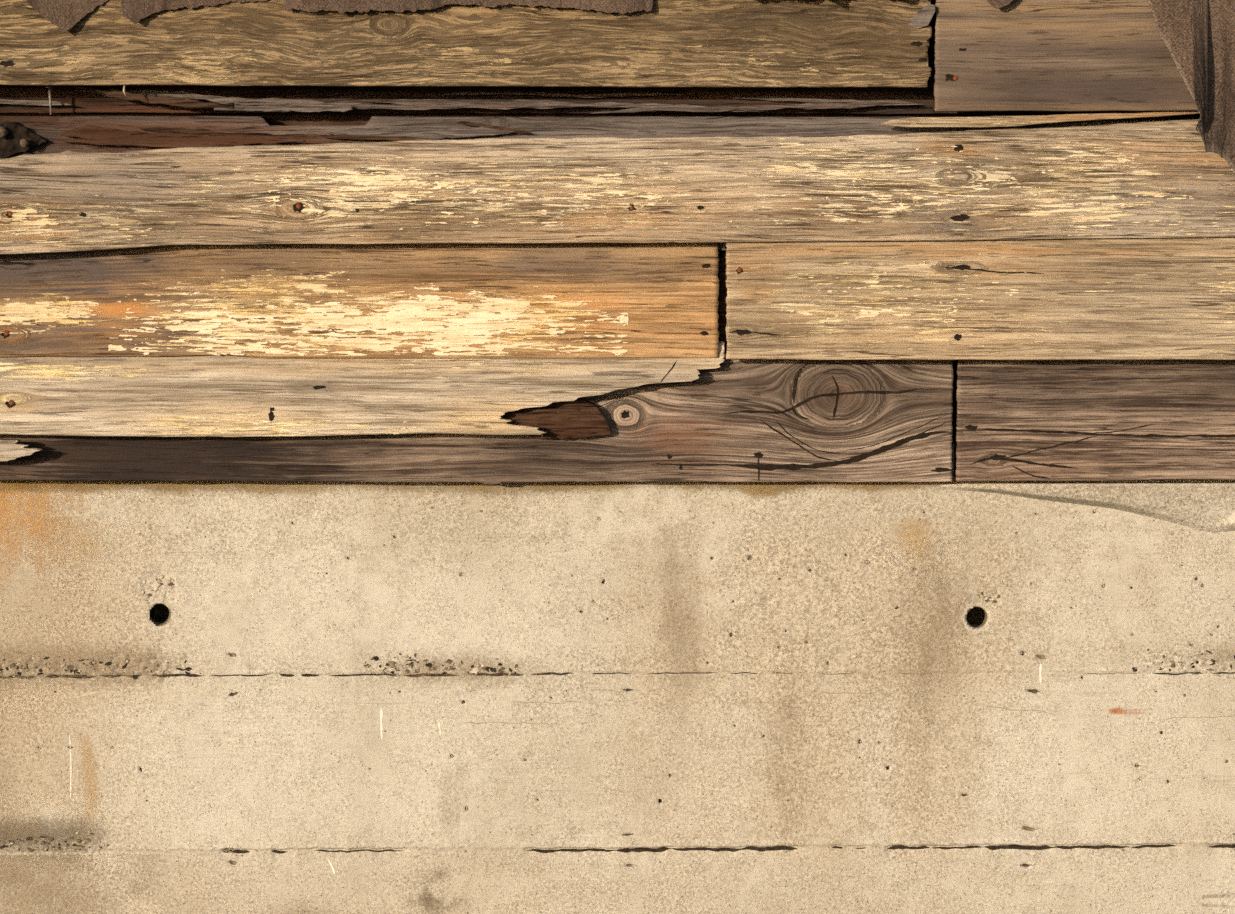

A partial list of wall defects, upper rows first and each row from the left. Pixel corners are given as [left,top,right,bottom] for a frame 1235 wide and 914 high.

peeling [804,146,1098,222]
peeling [1070,190,1194,223]
peeling [0,294,99,334]
peeling [84,265,629,373]
peeling [170,417,276,435]